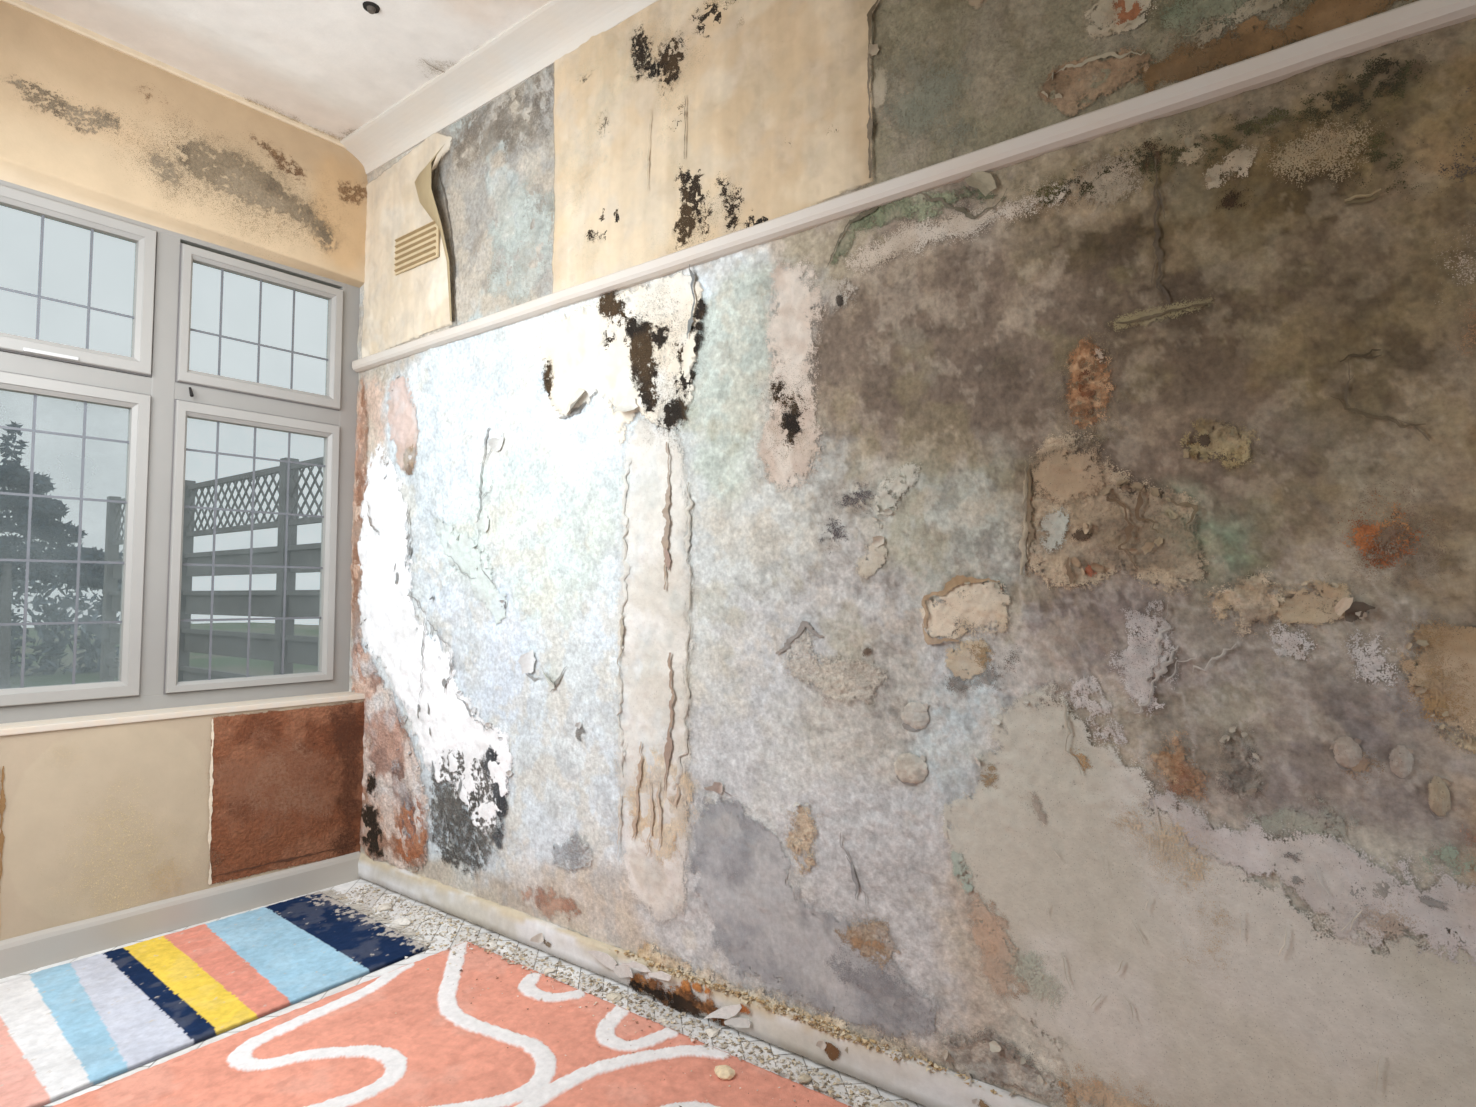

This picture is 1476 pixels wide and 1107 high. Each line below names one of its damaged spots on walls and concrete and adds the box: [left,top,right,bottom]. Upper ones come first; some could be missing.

water stain [2,74,367,264]
flaking render [431,63,555,328]
flaking render [859,0,1418,191]
water stain [1020,39,1476,214]
peeling [198,375,514,885]
flaking render [754,131,1149,494]
rust [1042,323,1144,451]
flaking render [1177,417,1269,472]
rust [1328,474,1465,596]
crack [0,766,8,928]
water stain [428,745,512,880]
flaking render [609,427,1476,1107]